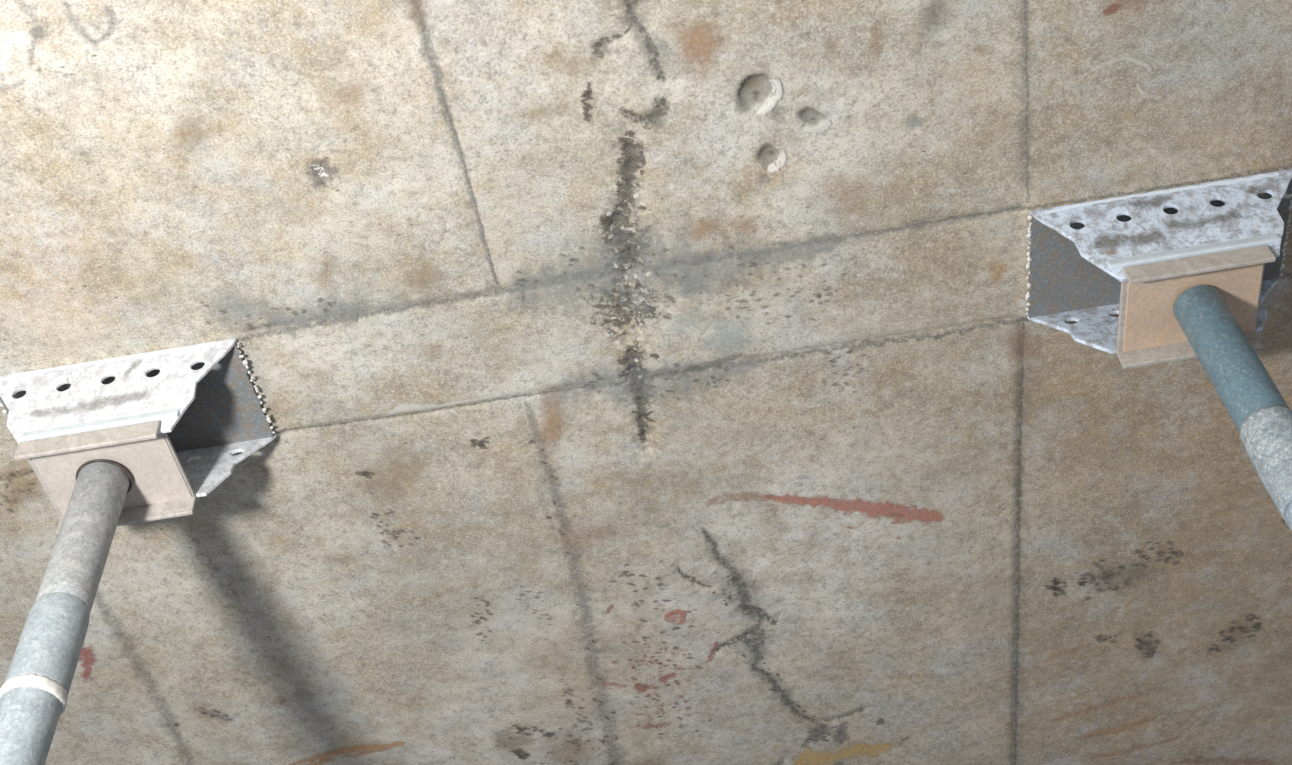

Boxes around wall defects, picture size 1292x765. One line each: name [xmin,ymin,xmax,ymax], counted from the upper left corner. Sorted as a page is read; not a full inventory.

spalling [739,74,782,115]
spalling [798,110,831,132]
spalling [759,146,786,172]
crack [580,0,669,440]
corrosion [709,494,943,539]
crack [677,530,862,722]
corrosion [79,648,95,679]